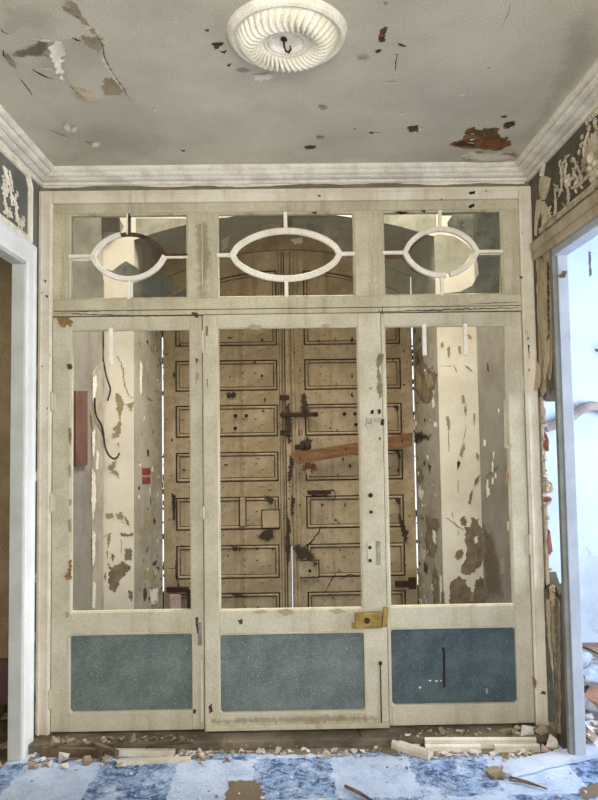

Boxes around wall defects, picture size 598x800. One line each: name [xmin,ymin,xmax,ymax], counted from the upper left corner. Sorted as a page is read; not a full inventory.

peeling [4,0,126,102]
corrosion [450,127,511,151]
peeling [403,329,461,433]
peeling [91,331,163,610]
spalling [416,455,484,604]
spalling [525,251,561,737]